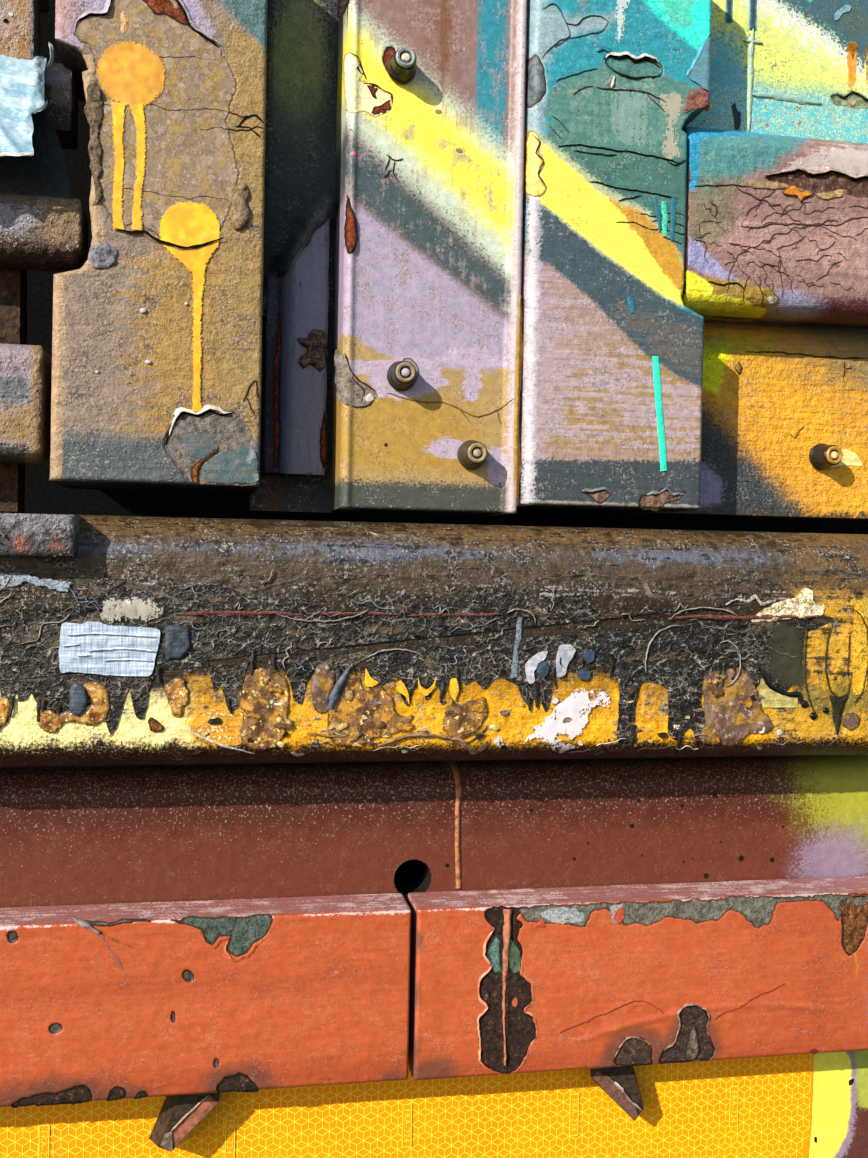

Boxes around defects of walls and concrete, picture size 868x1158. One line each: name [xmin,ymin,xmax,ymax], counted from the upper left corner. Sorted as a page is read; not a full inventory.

crack [542,3,667,113]
peeling [73,0,263,251]
crack [235,114,264,138]
crack [550,116,868,314]
peeling [747,148,868,202]
peeling [164,405,259,486]
peeling [0,572,833,756]
peeling [171,913,273,962]
rust [840,896,868,971]
crack [559,1000,662,1033]
peeling [477,893,868,1074]
crack [715,983,785,1019]